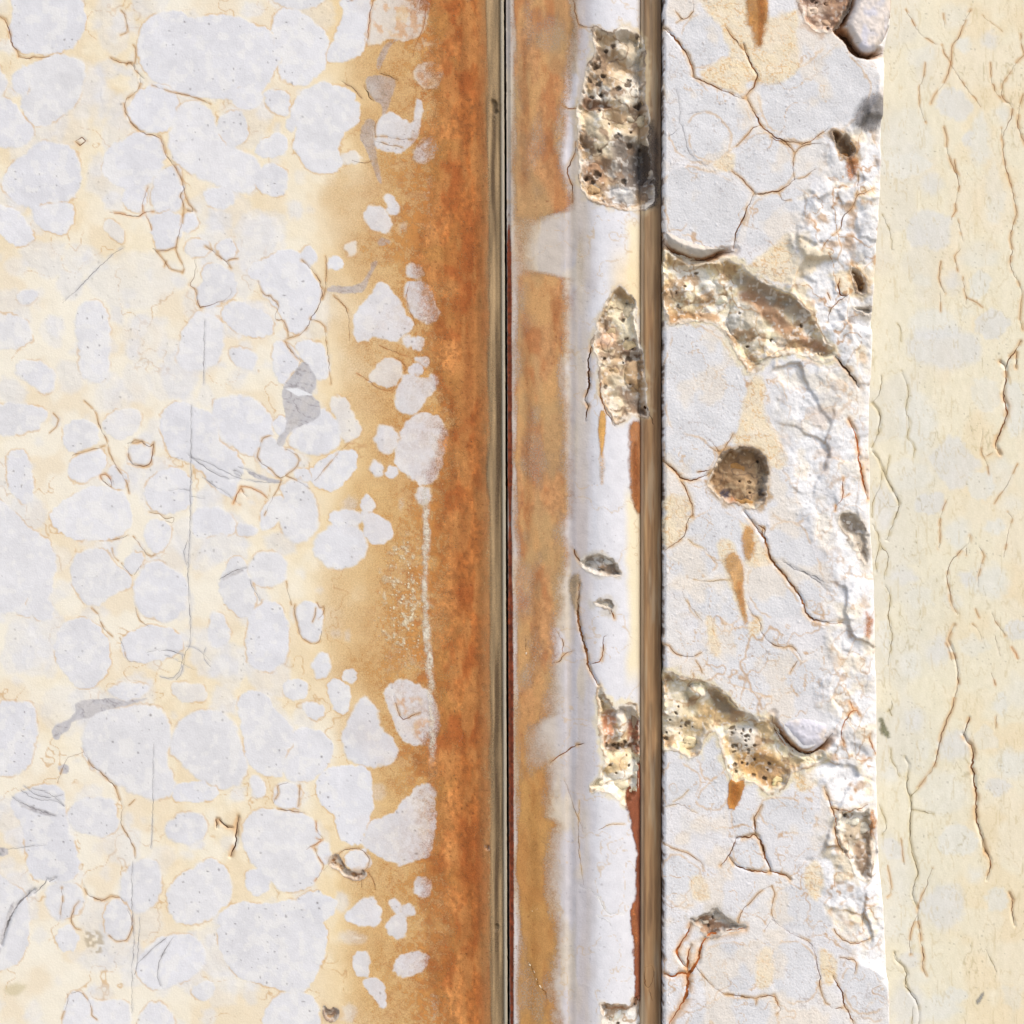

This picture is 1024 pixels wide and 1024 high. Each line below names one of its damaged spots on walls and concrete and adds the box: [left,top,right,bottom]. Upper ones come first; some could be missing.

spalling [576,25,656,211]
crack [664,9,826,248]
spalling [661,250,838,375]
corrosion [354,0,492,1024]
corrosion [507,0,576,1024]
corrosion [629,421,640,513]
spalling [707,446,770,509]
crack [747,515,843,624]
crack [824,10,1024,1021]
spalling [662,669,827,795]
corrosion [626,762,640,1001]
crack [644,806,868,1024]